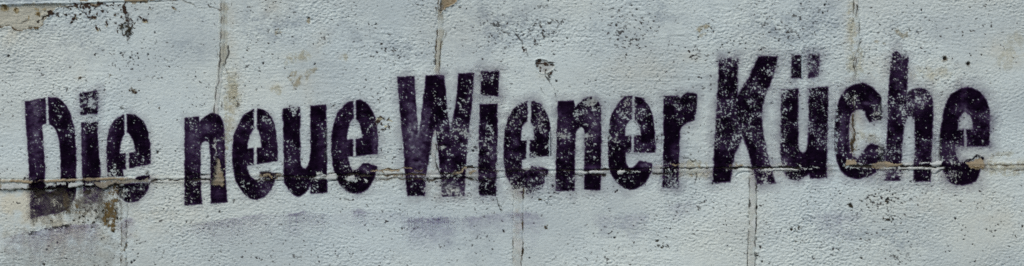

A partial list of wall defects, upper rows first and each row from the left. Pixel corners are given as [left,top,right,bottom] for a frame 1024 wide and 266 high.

peeling [0,0,152,31]
crack [173,0,238,113]
crack [150,174,211,183]
leakage [33,187,104,228]
crack [256,145,801,265]